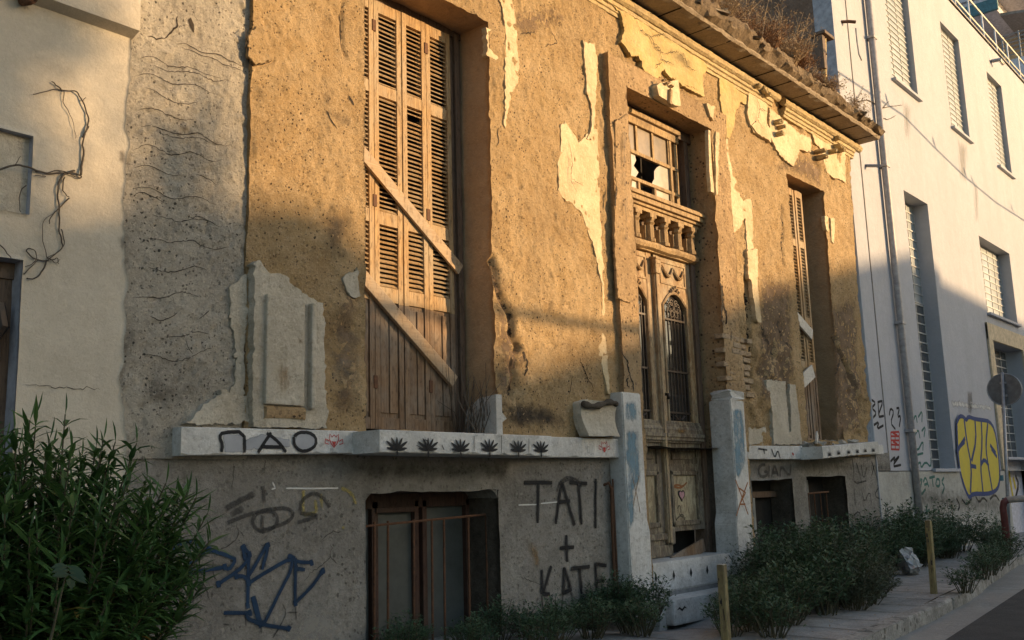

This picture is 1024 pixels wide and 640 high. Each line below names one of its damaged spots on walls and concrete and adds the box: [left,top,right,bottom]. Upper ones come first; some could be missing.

crack [149,16,178,40]
crack [641,30,695,71]
spalling [779,158,821,183]
crack [488,262,529,395]
spalling [714,282,794,400]